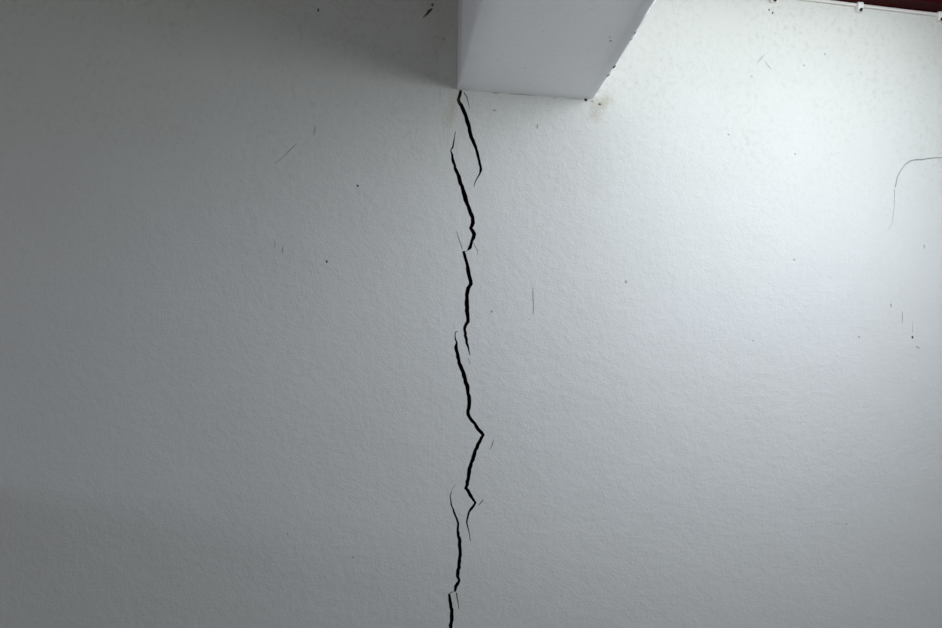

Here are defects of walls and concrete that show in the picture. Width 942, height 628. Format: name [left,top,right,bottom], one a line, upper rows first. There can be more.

crack [448,90,493,628]